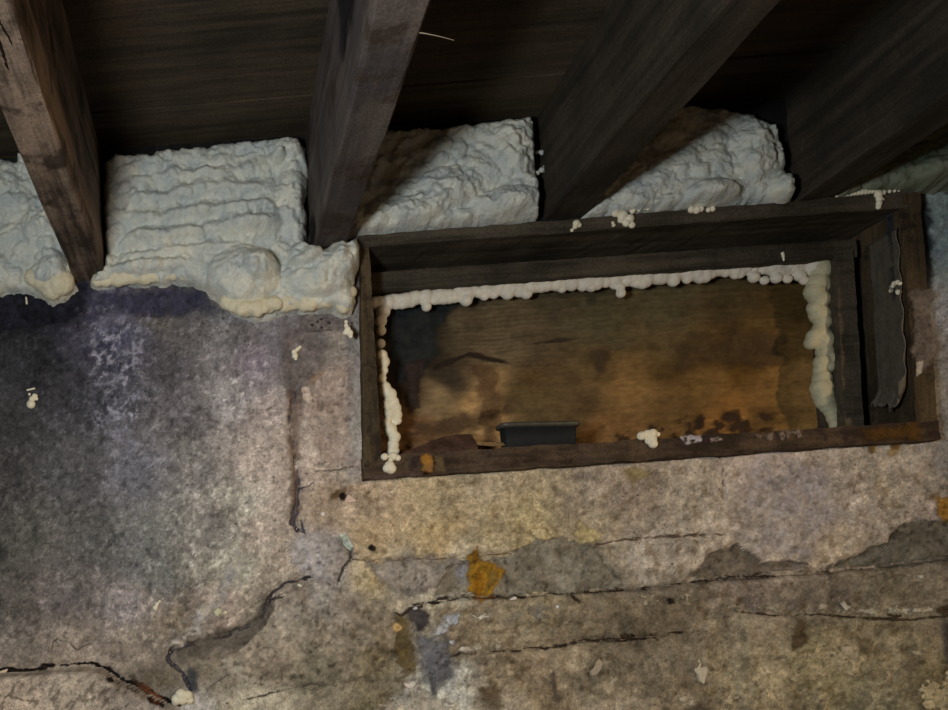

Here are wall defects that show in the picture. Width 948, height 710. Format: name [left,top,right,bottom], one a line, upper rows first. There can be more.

crack [0,391,446,709]
spalling [826,520,948,578]
corrosion [466,550,505,602]
crack [672,556,946,585]
crack [396,586,649,617]
crack [741,609,948,621]
crack [452,631,683,657]